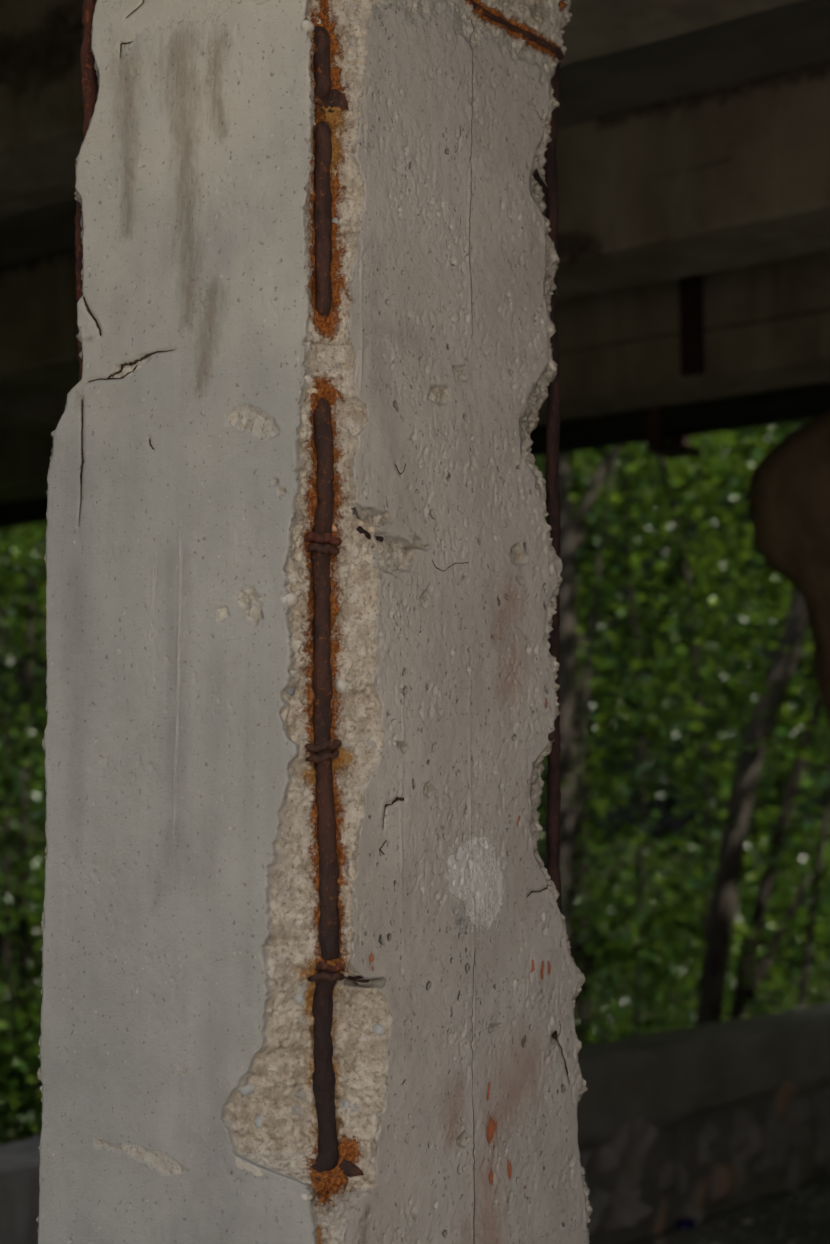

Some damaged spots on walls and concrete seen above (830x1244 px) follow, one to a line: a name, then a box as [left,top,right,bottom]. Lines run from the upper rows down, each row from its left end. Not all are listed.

rust [465,0,561,61]
rust [304,0,353,341]
crack [83,296,102,336]
spalling [46,0,233,531]
crack [78,349,174,527]
spalling [218,0,588,1244]
rust [300,370,353,1083]
rust [300,1105,364,1206]
spalling [580,1161,592,1244]